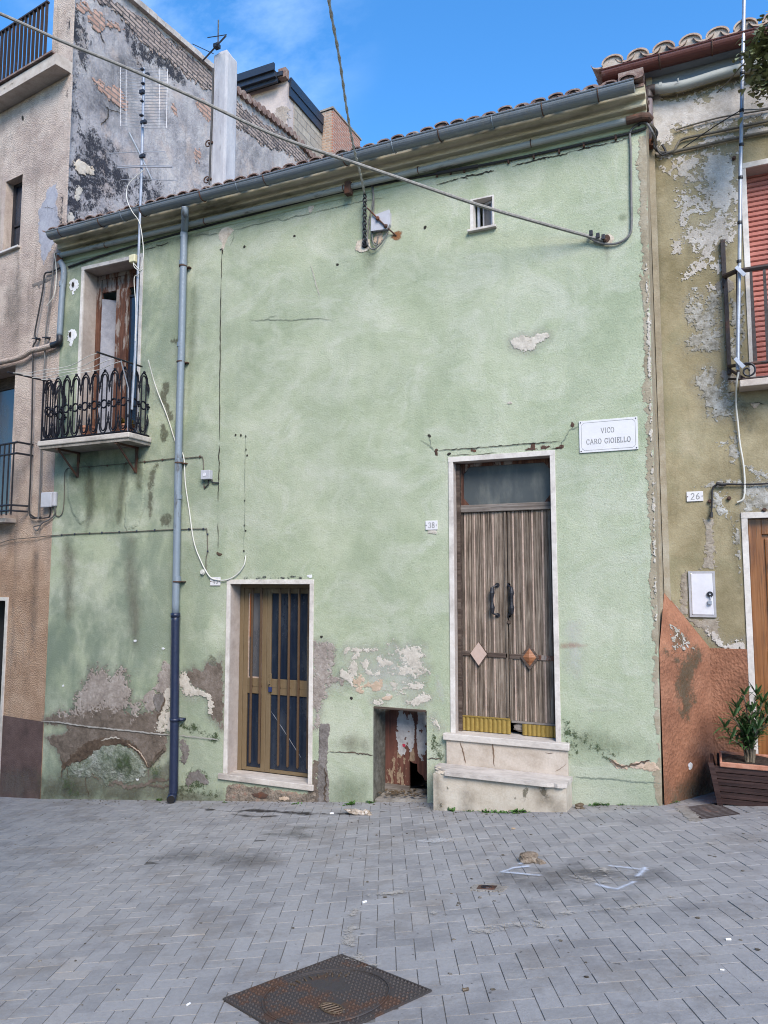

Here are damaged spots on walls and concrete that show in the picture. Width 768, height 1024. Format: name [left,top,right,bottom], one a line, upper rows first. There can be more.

flaking render [75,0,212,122]
peeling [67,159,95,222]
crack [440,137,629,184]
peeling [653,78,768,359]
crack [195,197,385,559]
peeling [510,333,549,352]
peeling [608,399,662,806]
peeling [43,647,209,789]
peeling [186,661,224,729]
peeling [313,636,432,729]
leakage [665,632,702,720]
crack [545,752,661,784]